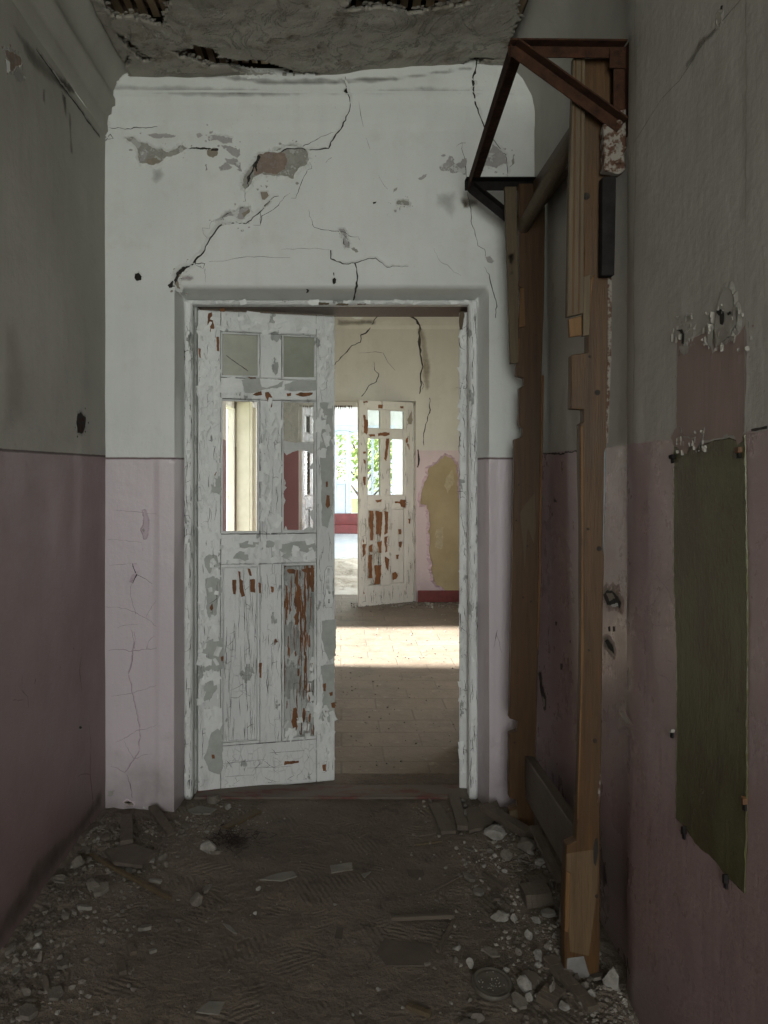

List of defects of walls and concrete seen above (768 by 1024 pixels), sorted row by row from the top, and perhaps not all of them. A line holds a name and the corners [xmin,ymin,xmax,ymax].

spalling [123,124,315,232]
flaking render [178,51,289,79]
crack [166,76,408,300]
crack [469,60,513,177]
peeling [307,299,420,319]
crack [406,317,431,467]
flaking render [671,304,754,455]
crack [109,539,157,796]
crack [184,317,395,794]
crack [360,442,413,603]
spalling [362,300,478,780]
spalling [603,575,625,615]